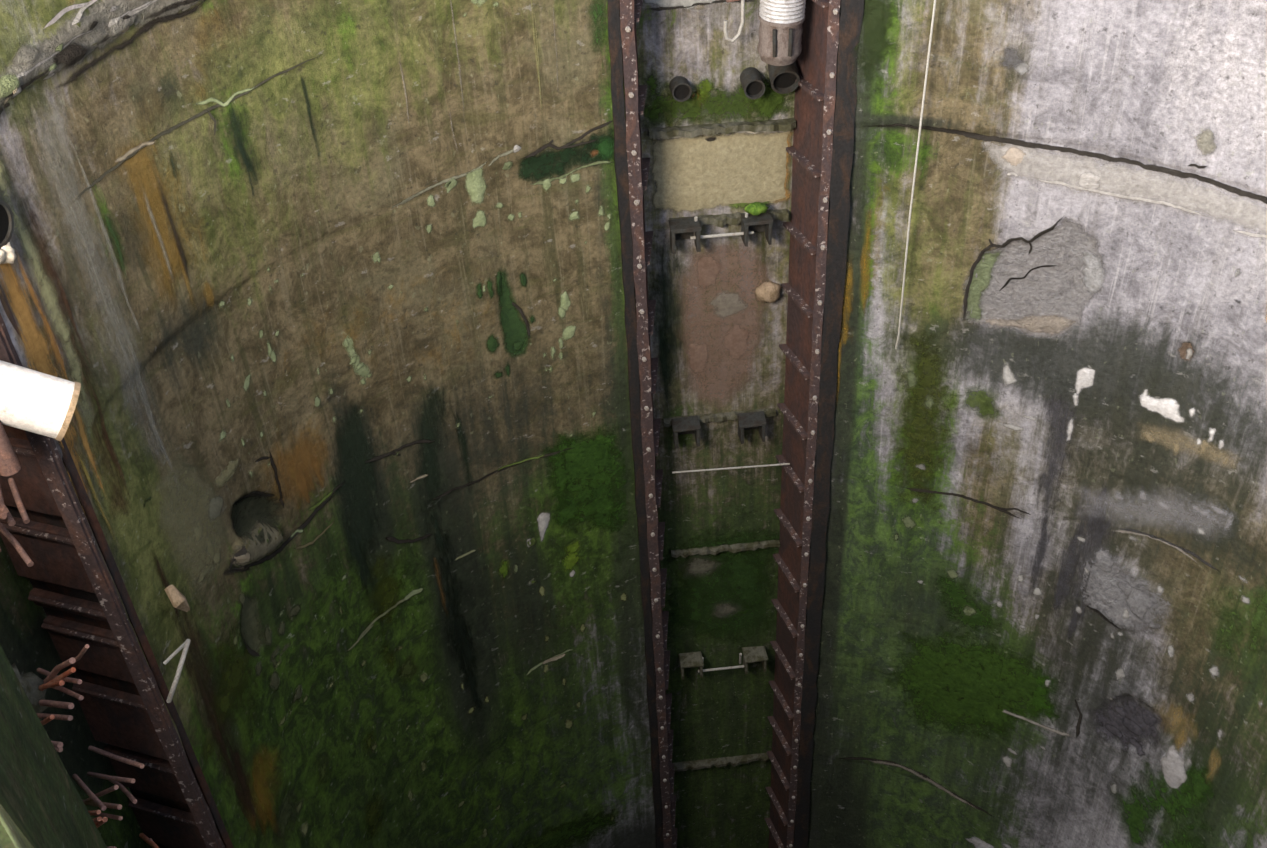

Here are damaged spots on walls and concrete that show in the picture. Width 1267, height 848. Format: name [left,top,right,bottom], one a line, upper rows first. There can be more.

spalling [0,0,205,114]
crack [879,124,1267,204]
peeling [985,142,1267,238]
rust [0,166,111,529]
rust [836,226,870,392]
crack [963,217,1063,320]
spalling [964,218,1105,337]
spalling [231,453,284,544]
water stain [335,407,383,623]
water stain [420,387,471,500]
water stain [1031,398,1074,587]
water stain [1053,489,1111,637]